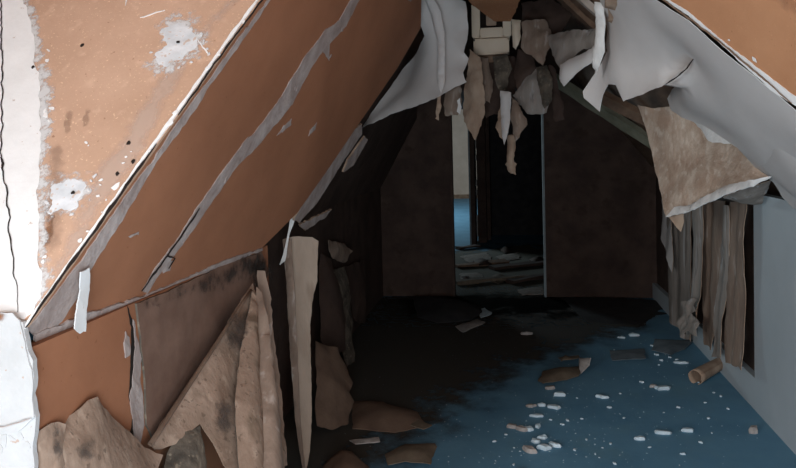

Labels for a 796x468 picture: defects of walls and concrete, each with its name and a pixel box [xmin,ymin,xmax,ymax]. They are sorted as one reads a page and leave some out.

crack [0,0,18,312]